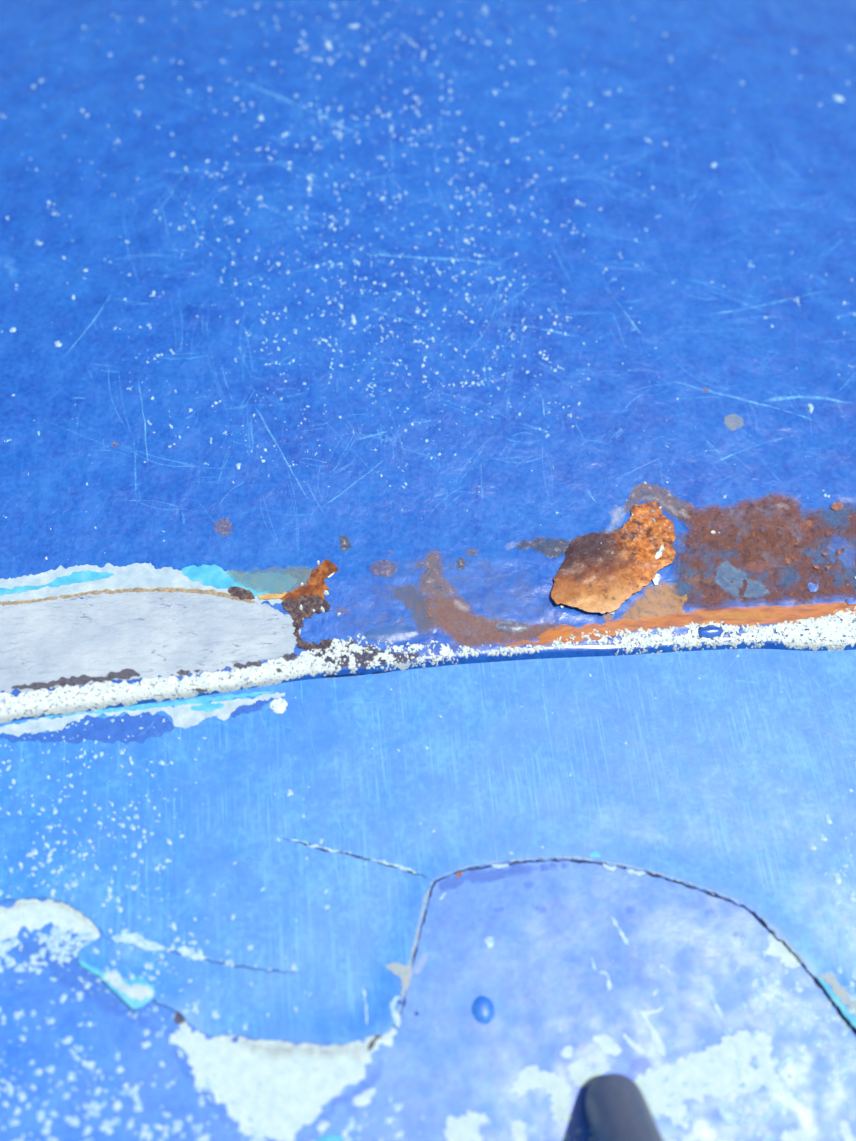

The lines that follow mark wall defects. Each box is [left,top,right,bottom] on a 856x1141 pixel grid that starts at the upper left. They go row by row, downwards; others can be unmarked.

corrosion [371,561,396,575]
corrosion [395,484,856,647]
peeling [0,556,856,1141]
crack [284,838,856,1033]